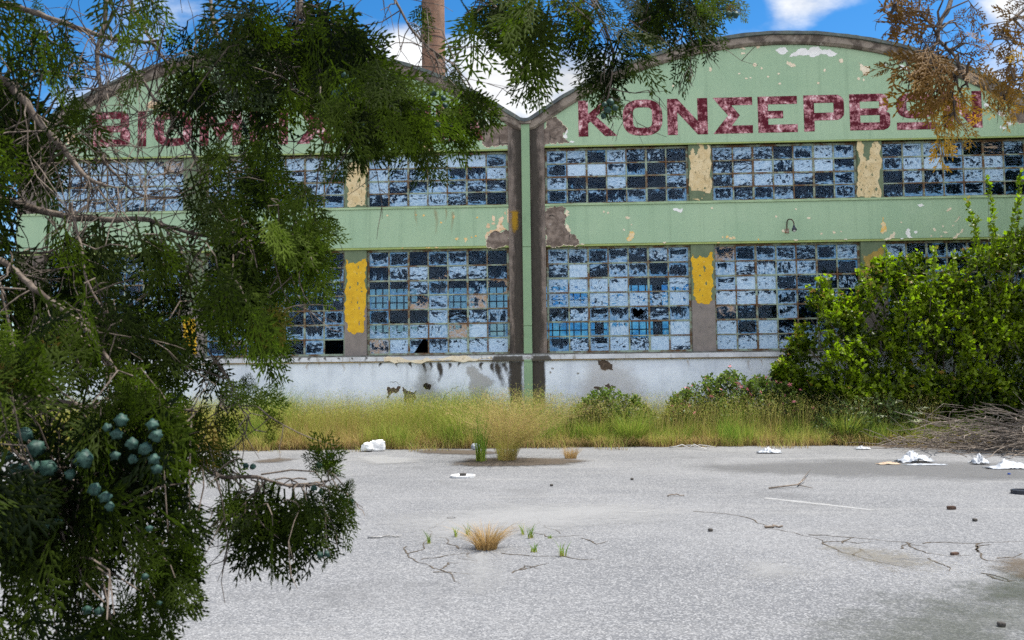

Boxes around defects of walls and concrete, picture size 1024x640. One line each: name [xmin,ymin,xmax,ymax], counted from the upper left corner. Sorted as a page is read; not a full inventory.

peeling [738,46,843,85]
flaking render [544,116,574,146]
peeling [346,162,368,207]
peeling [689,144,713,209]
peeling [856,141,882,198]
flaking render [455,209,509,249]
flaking render [545,206,584,248]
peeling [691,236,735,304]
peeling [344,259,367,335]
water stain [395,362,461,402]
flaking render [593,360,616,391]